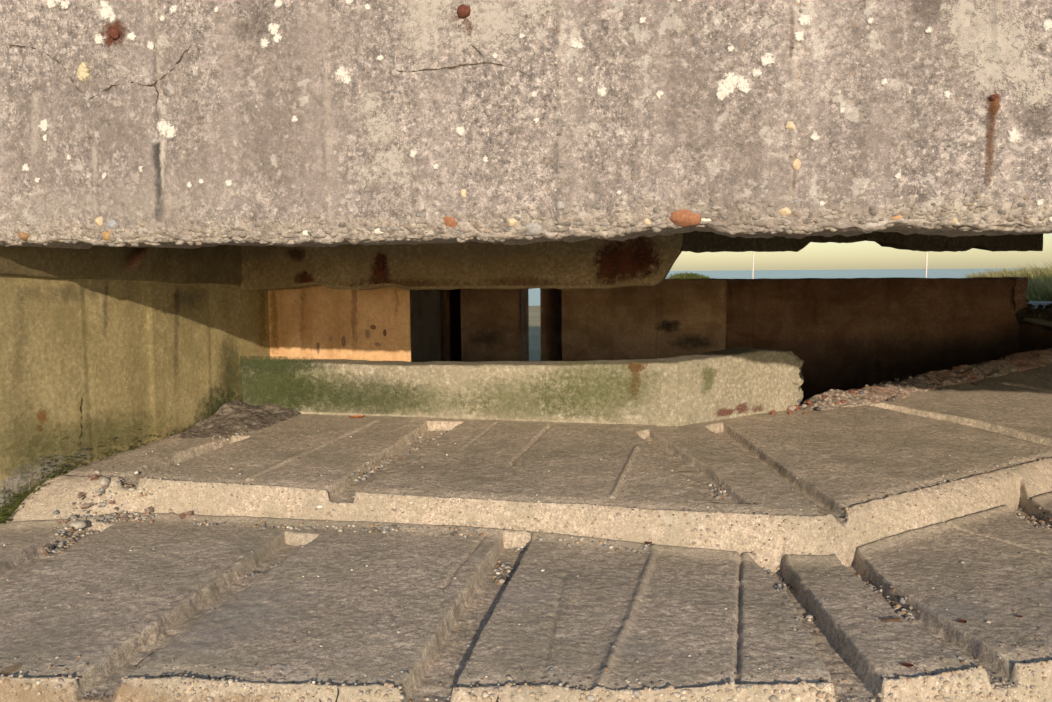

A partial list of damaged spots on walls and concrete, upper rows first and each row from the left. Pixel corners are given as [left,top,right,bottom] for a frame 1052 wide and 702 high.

crack [10,45,191,103]
rust [101,21,124,47]
crack [394,40,533,83]
rust [986,93,1000,184]
damp [153,138,167,218]
rust [351,252,457,287]
rust [596,237,660,285]
damp [0,454,75,523]